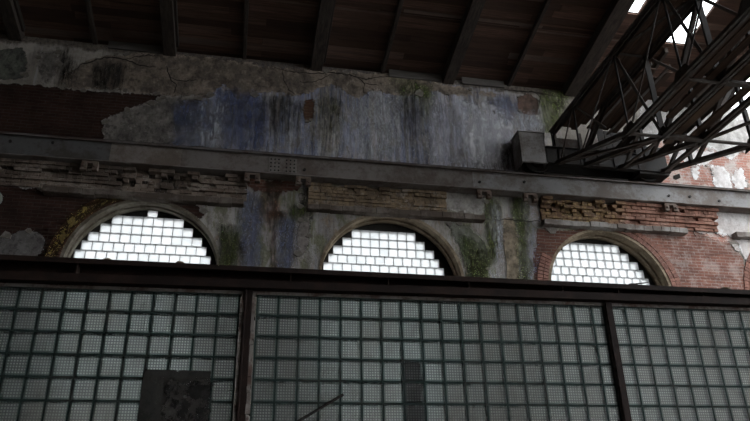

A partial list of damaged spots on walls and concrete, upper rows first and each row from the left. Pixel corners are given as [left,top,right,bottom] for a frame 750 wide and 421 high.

crack [71,54,196,93]
water stain [175,90,301,150]
flaking render [0,48,500,145]
water stain [320,86,563,169]
flaking render [643,107,687,148]
flaking render [661,108,750,190]
flaking render [0,186,120,256]
flaking render [532,227,586,280]
flaking render [626,212,750,290]